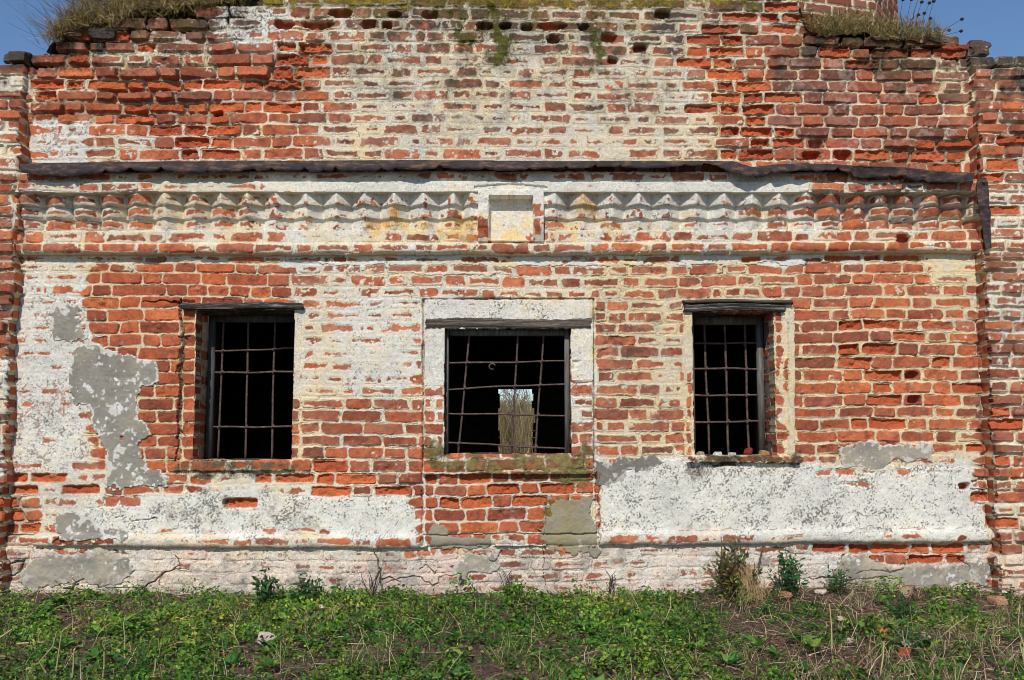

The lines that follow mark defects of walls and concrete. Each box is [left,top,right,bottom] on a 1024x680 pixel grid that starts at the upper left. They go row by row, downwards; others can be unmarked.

water stain [469,0,538,66]
spalling [12,1,403,163]
spalling [989,204,1022,216]
peeling [676,233,976,286]
peeling [0,273,467,573]
water stain [422,440,444,464]
spalling [443,327,516,455]
spalling [439,472,576,509]
spalling [564,328,572,453]
water stain [554,441,591,488]
peeling [598,311,1023,591]
crack [372,551,453,589]